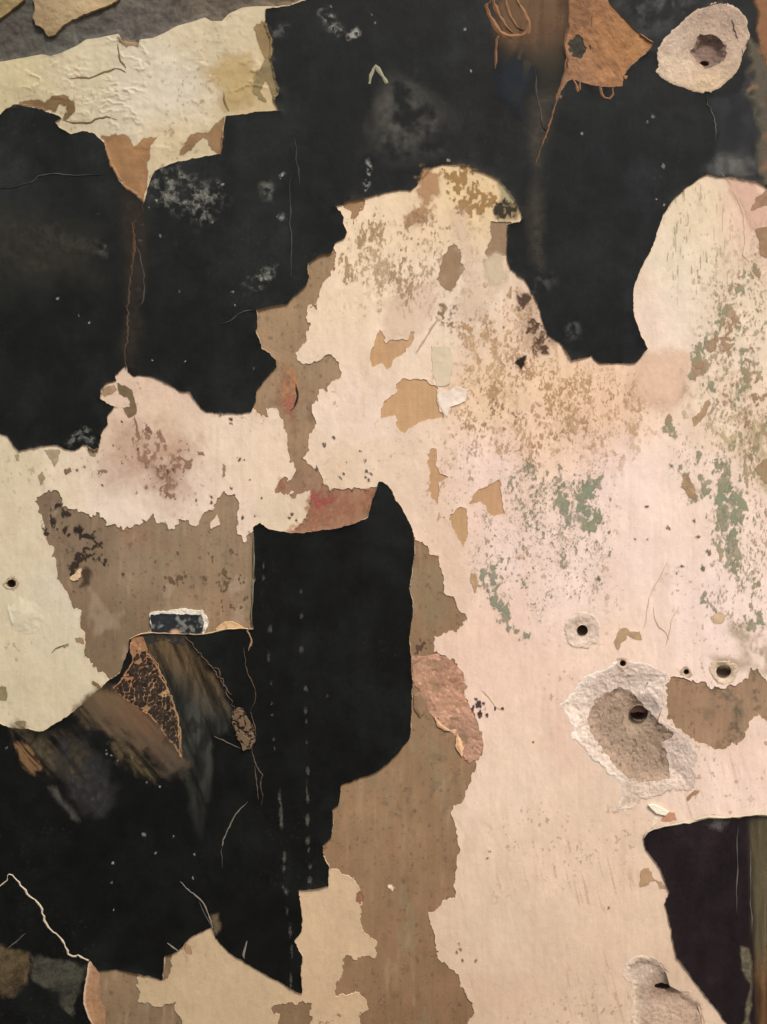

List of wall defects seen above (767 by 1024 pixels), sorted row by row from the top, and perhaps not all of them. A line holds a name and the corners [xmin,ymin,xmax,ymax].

spalling [656,0,750,93]
peeling [0,0,304,204]
peeling [133,633,187,645]
peeling [149,608,209,635]
peeling [215,621,243,630]
peeling [661,812,677,822]
crack [0,874,89,961]
peeling [83,928,331,1024]
peeling [295,868,377,1024]
peeling [639,868,655,887]